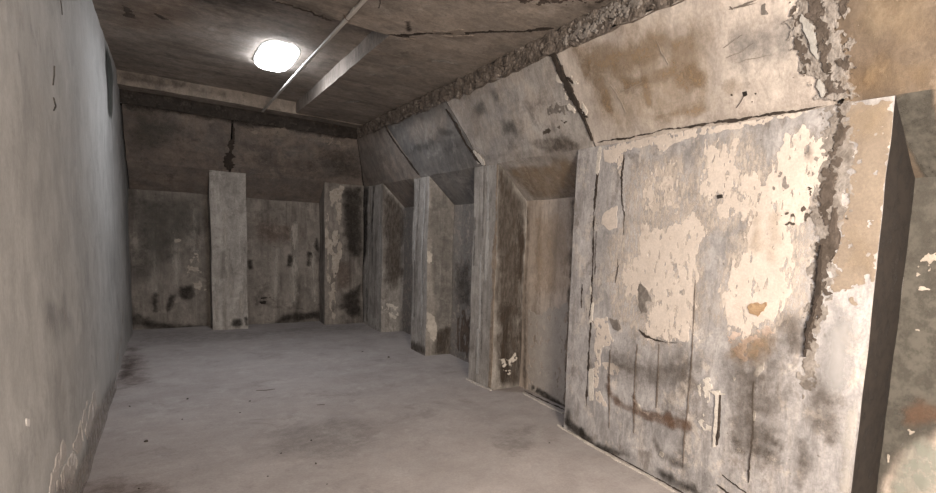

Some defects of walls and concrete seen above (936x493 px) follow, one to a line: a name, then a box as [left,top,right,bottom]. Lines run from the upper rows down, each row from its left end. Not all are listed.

crack [388,27,554,41]
peeling [518,0,655,45]
crack [445,109,485,166]
damp [343,187,425,354]
damp [437,162,575,384]
crack [548,52,821,427]
peeling [593,0,893,407]
damp [532,387,619,455]
crack [609,280,696,493]
damp [660,471,696,493]
damp [697,377,725,447]
crack [717,388,754,493]